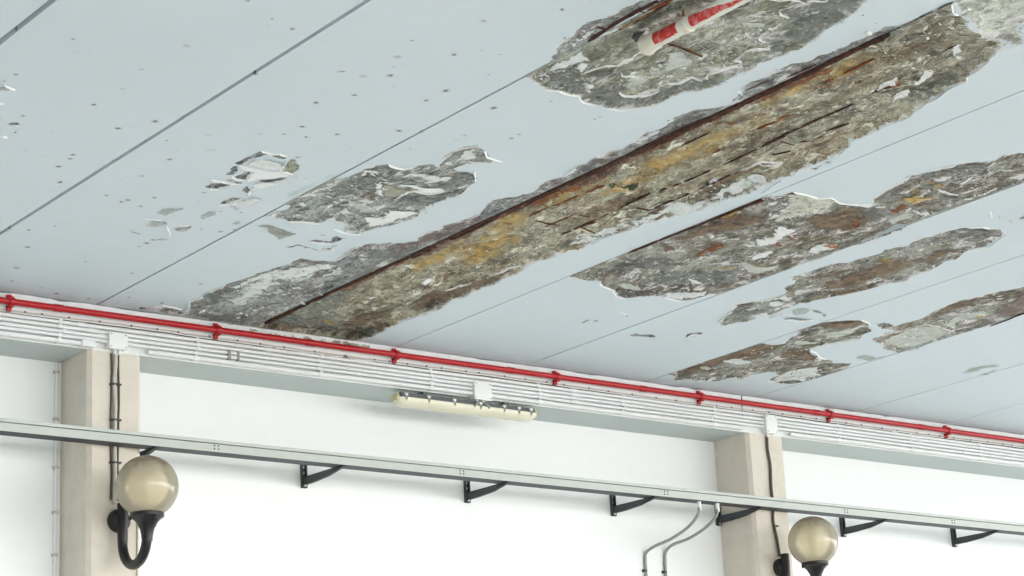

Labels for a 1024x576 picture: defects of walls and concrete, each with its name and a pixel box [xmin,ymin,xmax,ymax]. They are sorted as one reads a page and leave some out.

spalling [135,0,1024,342]
peeling [668,287,1024,384]